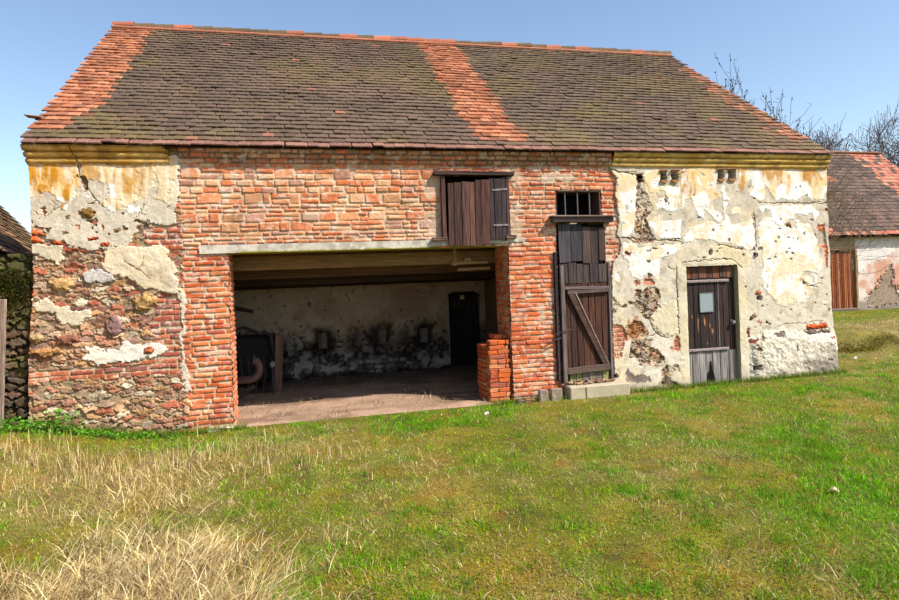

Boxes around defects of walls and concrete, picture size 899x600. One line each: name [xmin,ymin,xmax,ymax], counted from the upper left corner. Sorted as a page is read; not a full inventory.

damp [28,164,57,193]
crack [53,146,100,210]
flaking render [28,154,192,392]
peeling [612,167,829,386]
spalling [845,238,899,309]